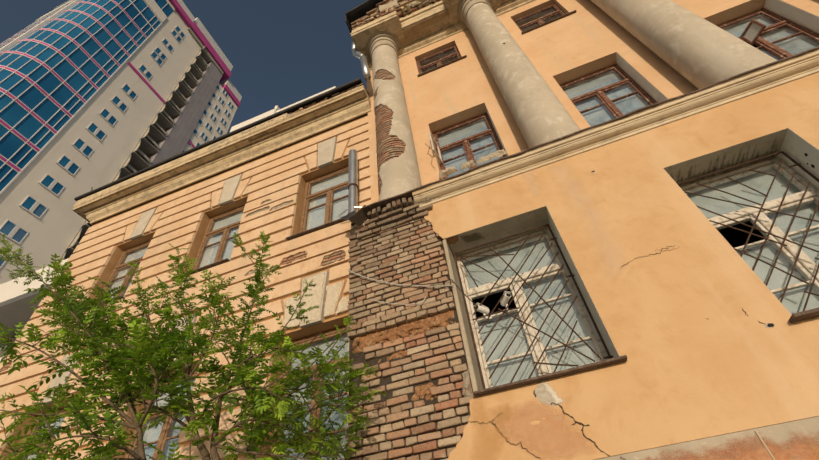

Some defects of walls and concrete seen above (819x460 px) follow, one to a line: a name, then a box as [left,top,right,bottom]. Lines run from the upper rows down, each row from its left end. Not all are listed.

flaking render [379,0,421,12]
flaking render [374,70,395,80]
flaking render [241,83,406,195]
flaking render [280,217,481,460]
crack [469,412,541,460]
crack [533,390,626,460]